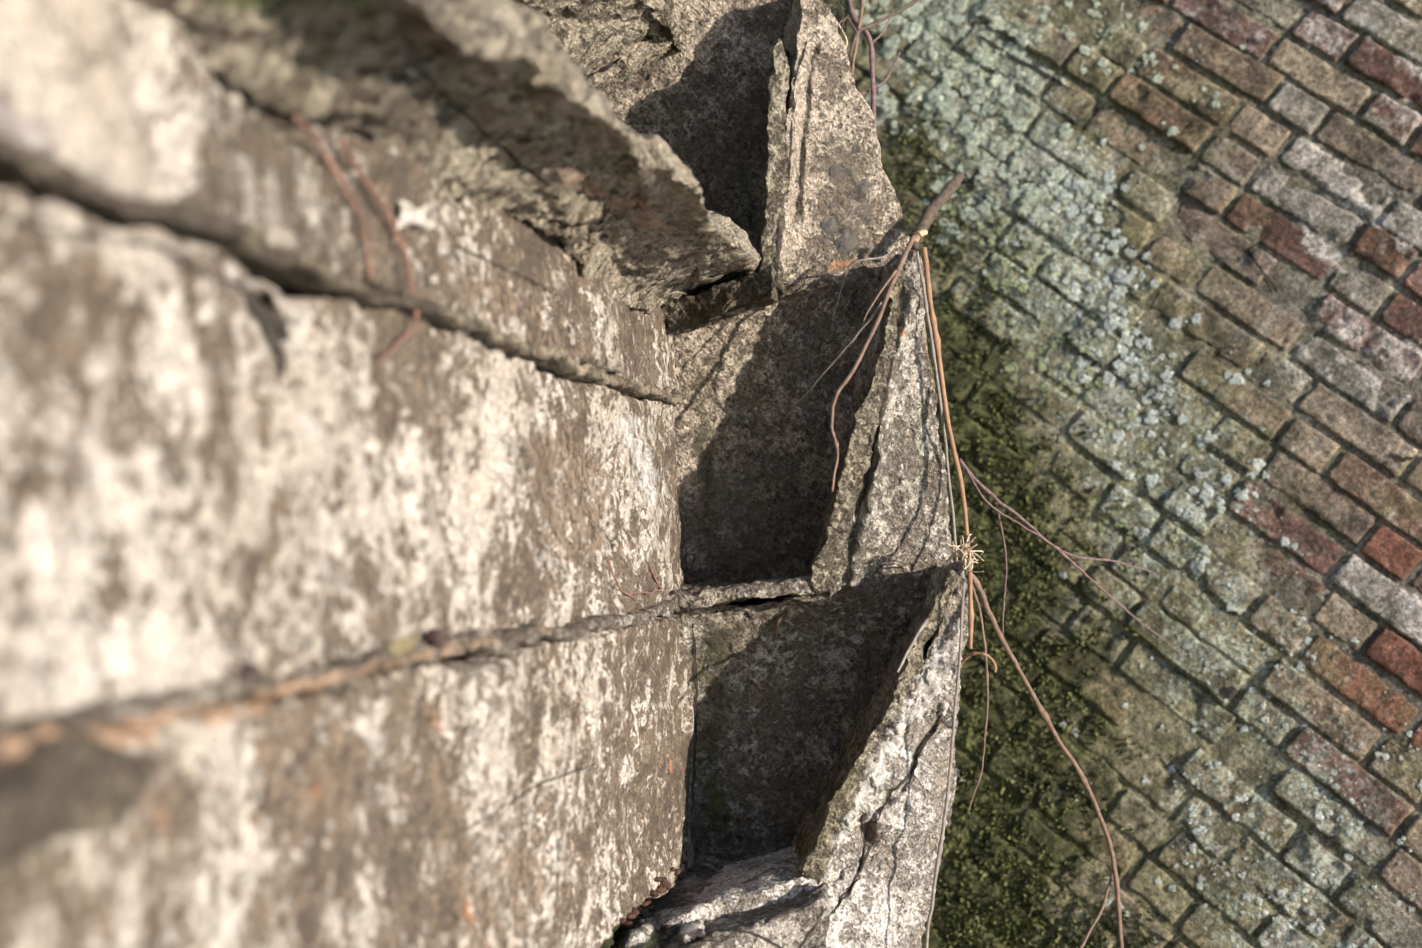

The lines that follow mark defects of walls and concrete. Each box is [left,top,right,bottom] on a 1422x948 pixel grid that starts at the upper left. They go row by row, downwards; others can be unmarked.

crack [740,717,952,948]